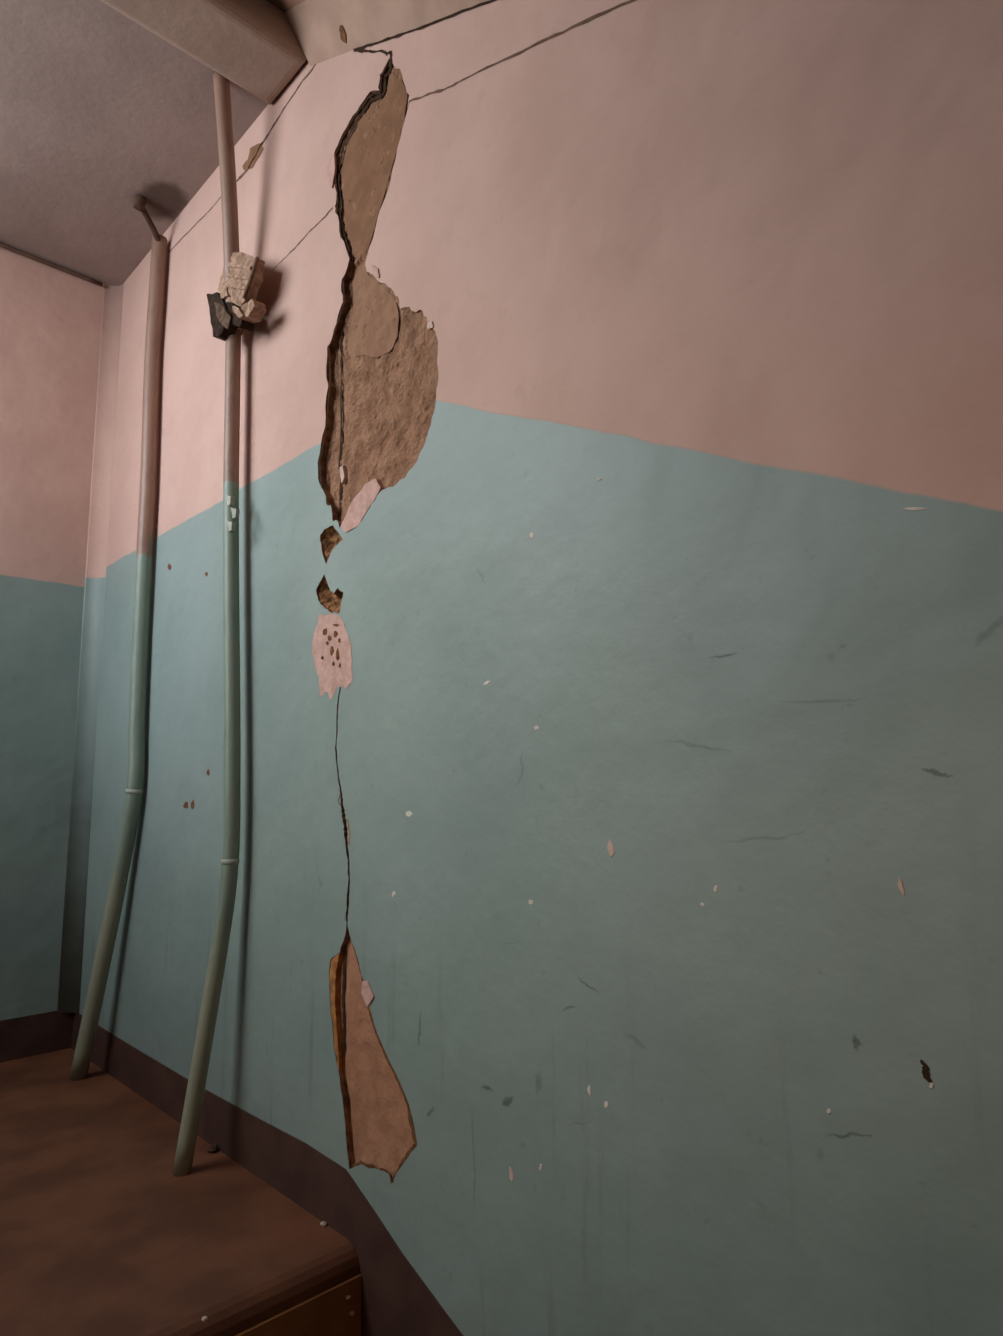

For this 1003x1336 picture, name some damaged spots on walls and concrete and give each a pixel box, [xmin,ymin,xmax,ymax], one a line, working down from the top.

crack [353,0,496,67]
crack [409,0,636,103]
peeling [218,285,267,323]
flaking render [318,60,438,561]
peeling [312,578,352,699]
crack [338,793,350,845]
flaking render [329,938,417,1184]